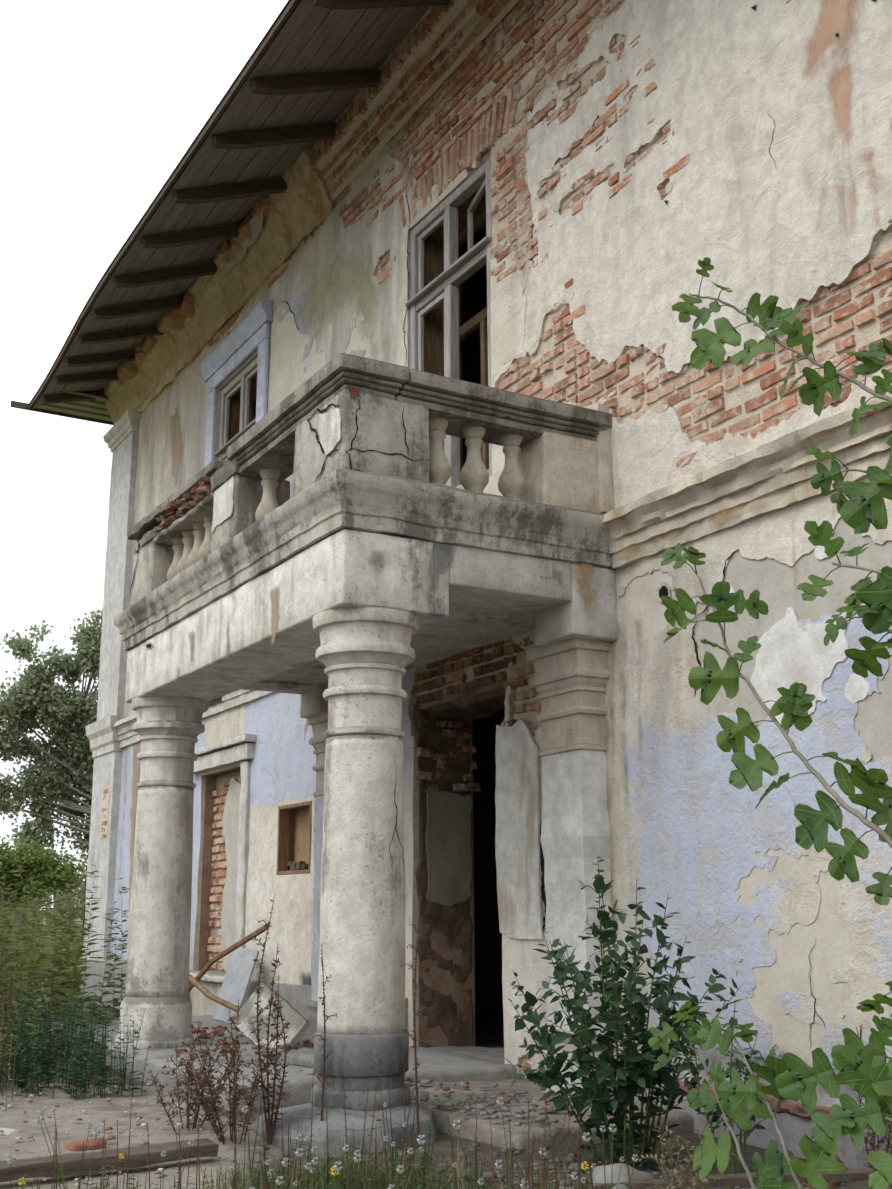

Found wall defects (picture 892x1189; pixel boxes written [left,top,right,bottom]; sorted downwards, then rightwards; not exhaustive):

flaking render [267,0,674,308]
flaking render [658,154,690,198]
flaking render [222,207,264,277]
flaking render [167,299,249,390]
flaking render [498,230,892,468]
crack [306,399,426,483]
flaking render [153,476,235,533]
flaking render [411,636,542,738]
flaking render [617,567,676,641]
crack [692,605,708,696]
flaking render [694,518,892,727]
flaking render [845,655,892,763]